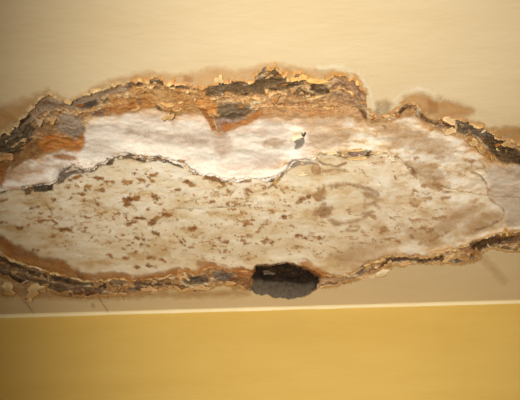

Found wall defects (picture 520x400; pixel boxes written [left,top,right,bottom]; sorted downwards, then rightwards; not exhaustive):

damp [305,64,473,117]
damp [67,115,286,170]
flaking render [0,63,520,198]
damp [491,127,520,142]
corrosion [67,175,114,219]
corrosion [106,193,178,269]
crack [21,148,416,195]
corrosion [206,182,274,246]
damp [313,189,333,218]
corrosion [0,236,179,280]
flaking render [0,253,257,303]
flaking render [313,227,520,292]